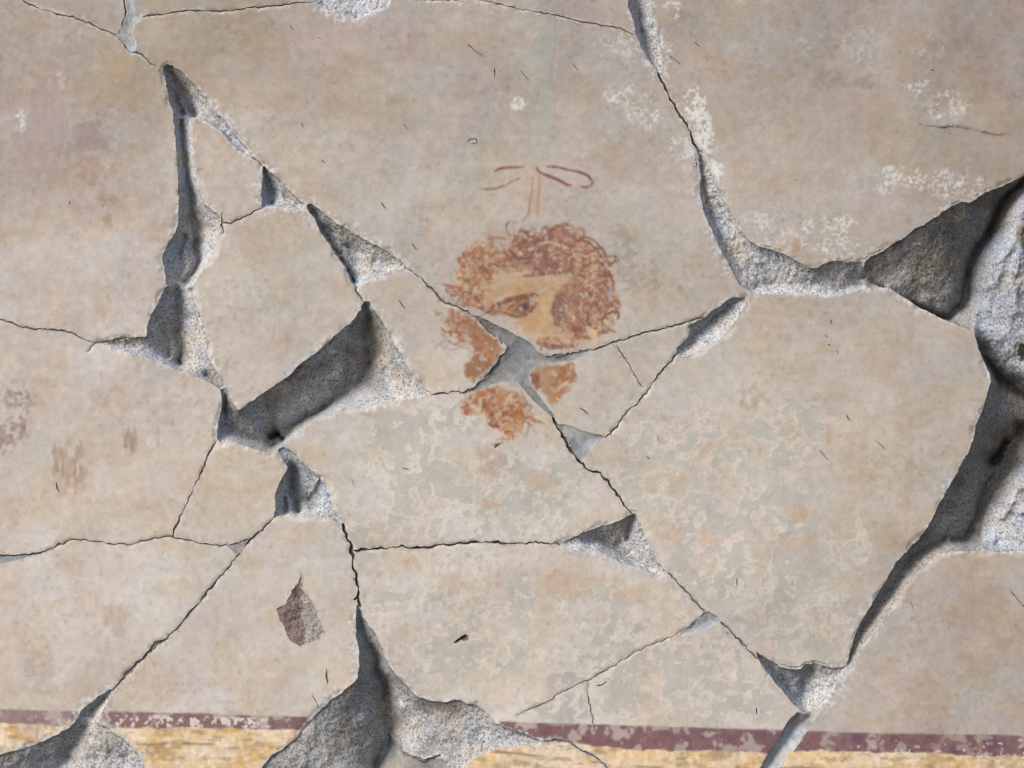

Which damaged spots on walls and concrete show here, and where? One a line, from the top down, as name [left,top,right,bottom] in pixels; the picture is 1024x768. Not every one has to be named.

crack [22,0,312,75]
crack [657,72,699,157]
crack [0,319,143,352]
crack [404,267,504,395]
peeling [100,64,1024,730]
crack [551,317,704,438]
crack [551,416,632,514]
crack [0,442,273,691]
crack [342,523,561,608]
spalling [0,689,146,768]
spalling [262,605,543,768]
crack [517,573,758,768]